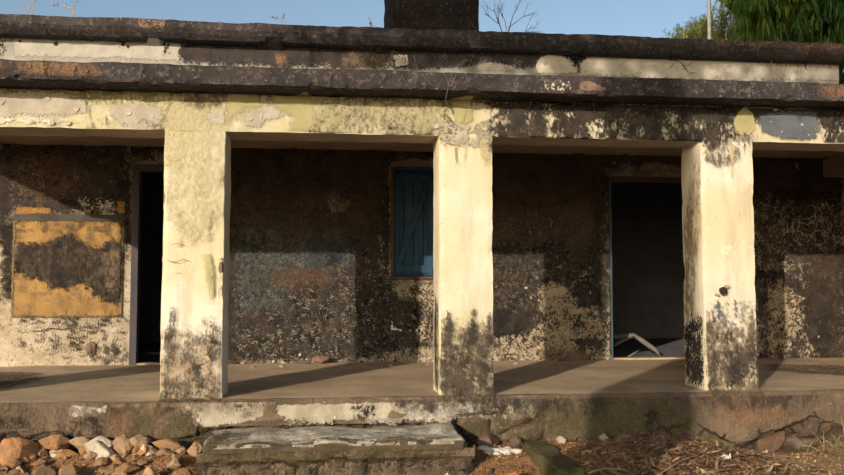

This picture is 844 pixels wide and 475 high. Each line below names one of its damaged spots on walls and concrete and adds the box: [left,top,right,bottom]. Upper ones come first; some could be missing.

peeling [0,90,90,126]
peeling [89,101,166,128]
leakage [471,100,844,175]
leakage [0,143,164,303]
peeling [78,197,125,213]
peeling [13,223,124,314]
leakage [104,148,611,449]
leakage [662,169,844,424]
leakage [12,315,128,365]
leakage [314,436,441,457]